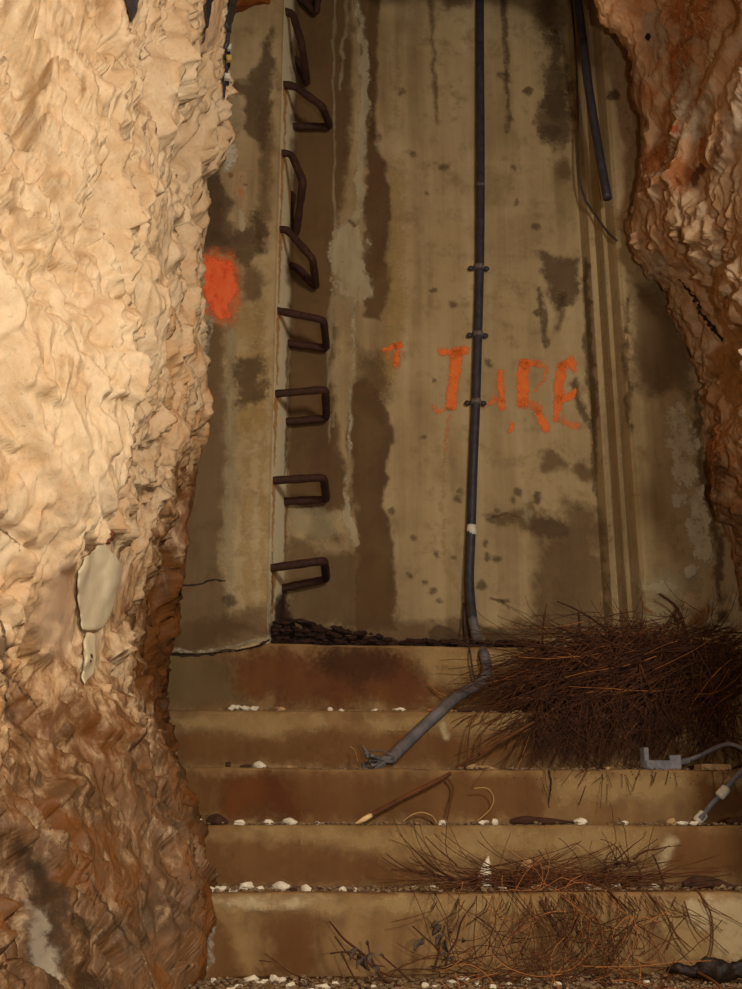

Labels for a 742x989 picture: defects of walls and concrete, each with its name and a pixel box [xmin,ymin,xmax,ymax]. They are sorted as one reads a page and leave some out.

corrosion [276,88,289,384]
damp [174,0,605,651]
crack [171,639,270,657]
corrosion [236,647,434,707]